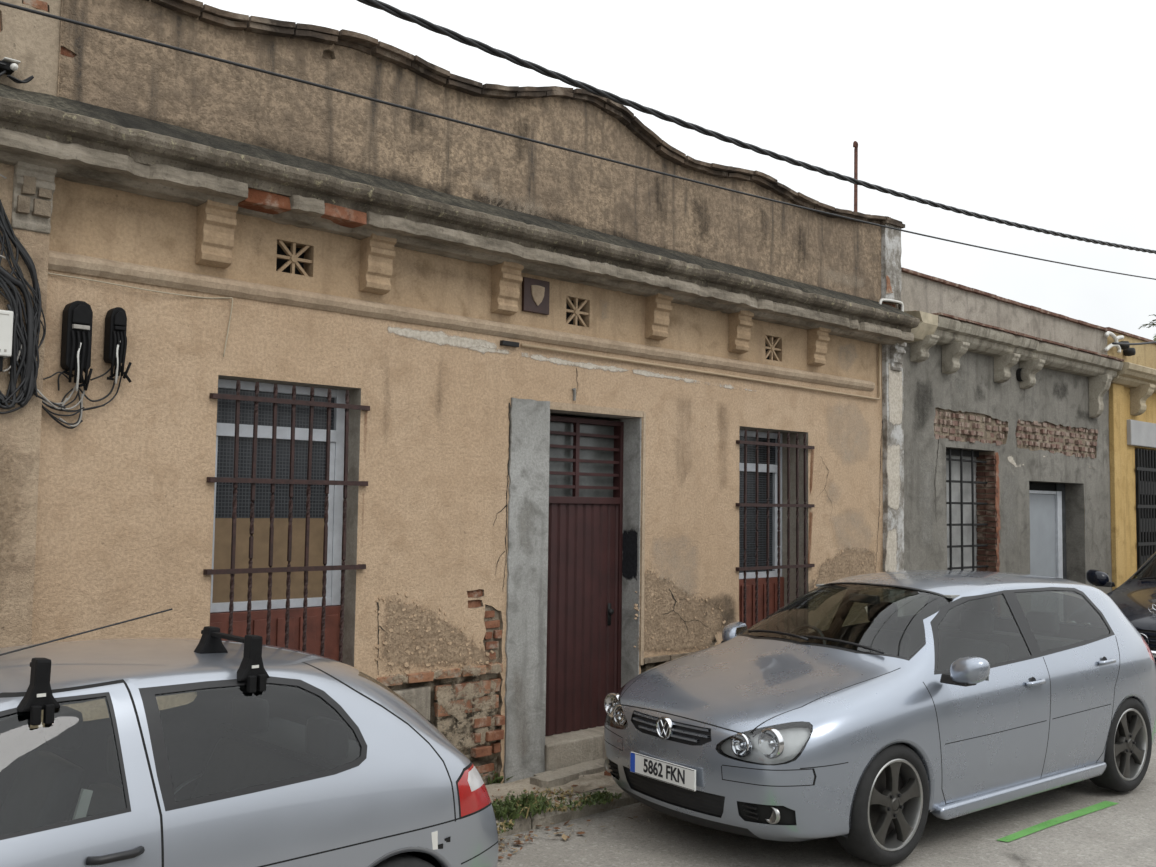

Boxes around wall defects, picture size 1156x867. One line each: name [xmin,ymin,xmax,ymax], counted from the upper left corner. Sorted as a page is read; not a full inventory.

flaking render [238,188,291,215]
flaking render [321,203,367,228]
flaking render [934,407,1098,572]
peeling [634,569,726,673]
flaking render [375,589,505,785]